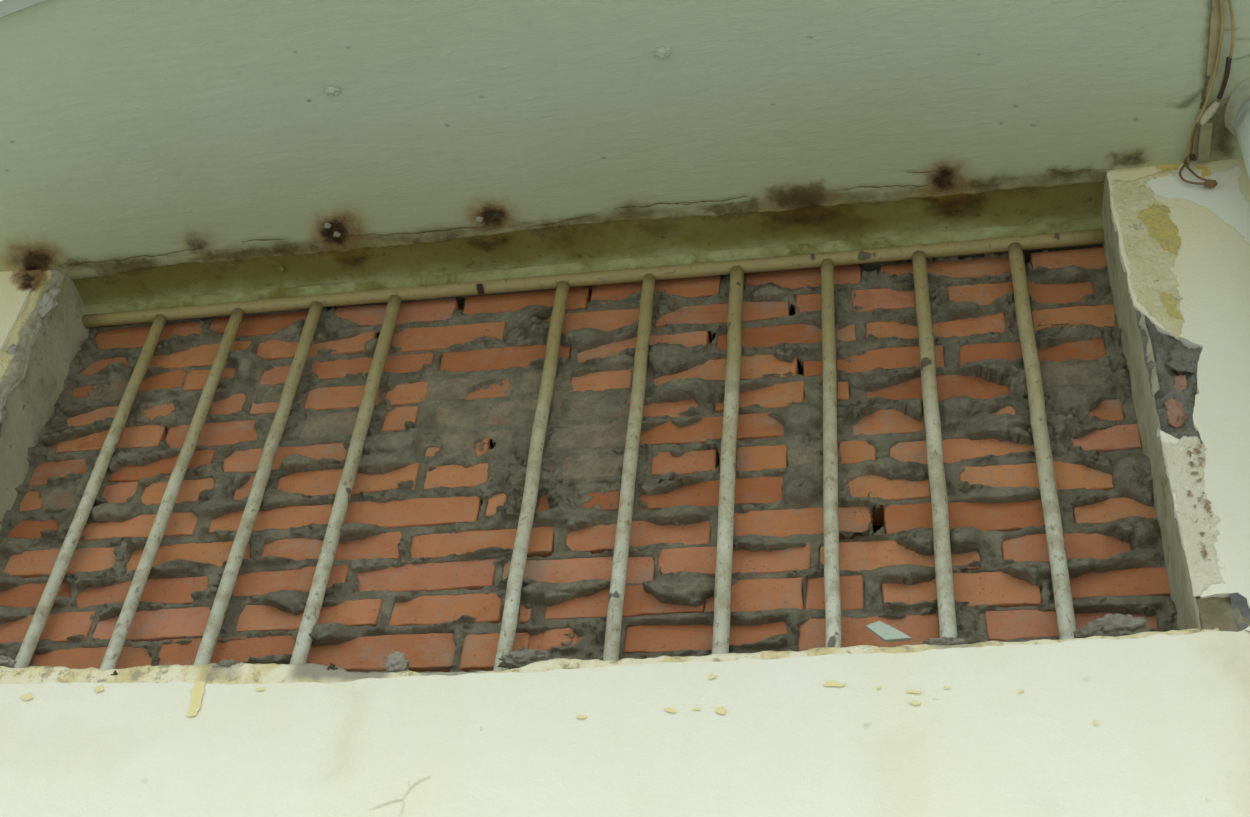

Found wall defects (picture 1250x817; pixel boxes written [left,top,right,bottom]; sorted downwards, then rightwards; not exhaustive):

rust [929,168,984,215]
rust [320,216,365,264]
rust [471,205,506,249]
rust [10,247,56,289]
spalling [0,163,1250,716]